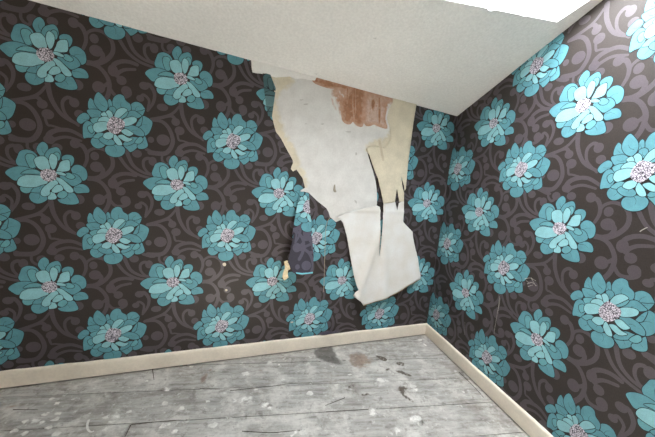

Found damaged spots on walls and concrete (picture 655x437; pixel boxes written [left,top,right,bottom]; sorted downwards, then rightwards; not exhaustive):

flaking render [251,60,385,222]
damp [311,78,393,131]